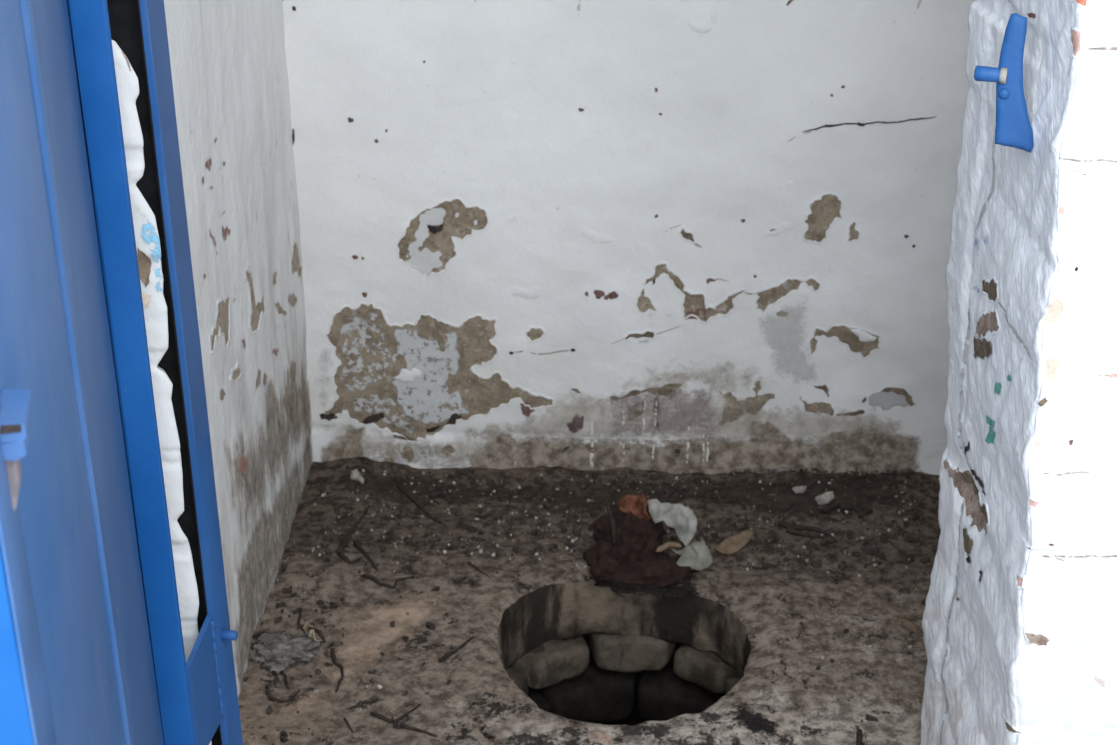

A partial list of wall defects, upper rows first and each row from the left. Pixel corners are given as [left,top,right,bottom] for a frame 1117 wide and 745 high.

crack [788,116,936,142]
peeling [395,196,490,277]
peeling [802,192,862,245]
crack [975,131,995,232]
peeling [612,261,822,344]
peeling [320,292,555,443]
crack [957,309,971,470]
water stain [237,366,312,527]
water stain [322,428,364,462]
water stain [682,426,709,473]
flaking render [942,453,990,581]
crack [940,500,964,745]